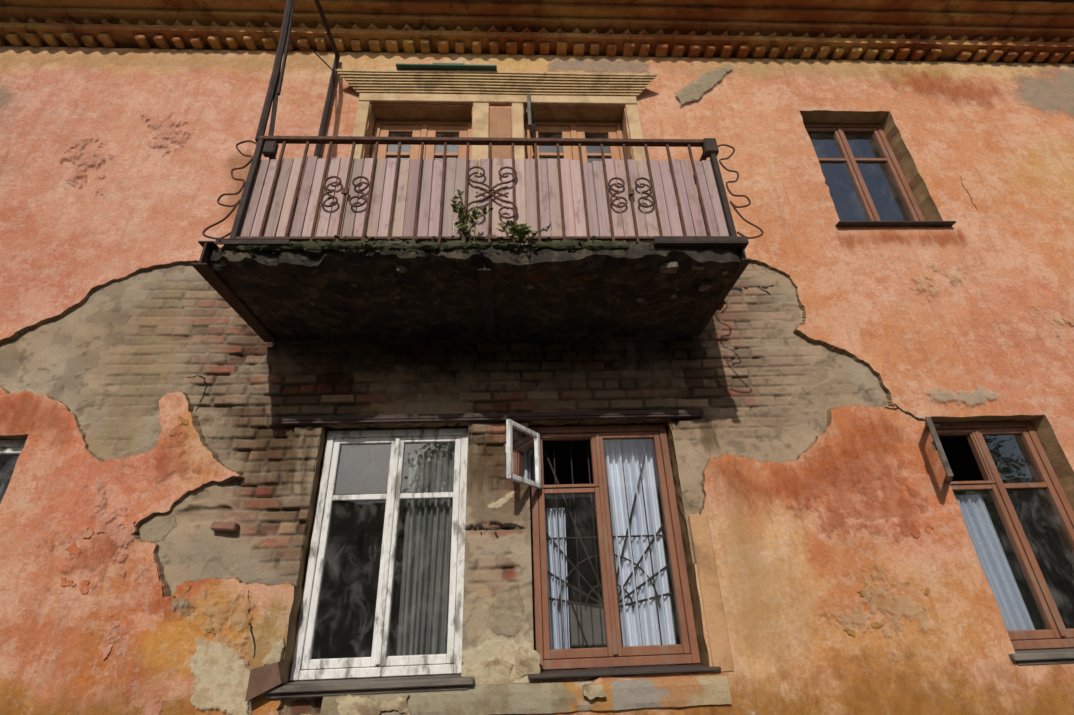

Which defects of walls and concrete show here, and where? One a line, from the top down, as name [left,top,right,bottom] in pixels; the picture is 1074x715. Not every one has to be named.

damp [1016,68,1074,115]
flaking render [0,260,895,715]
peeling [822,562,930,637]